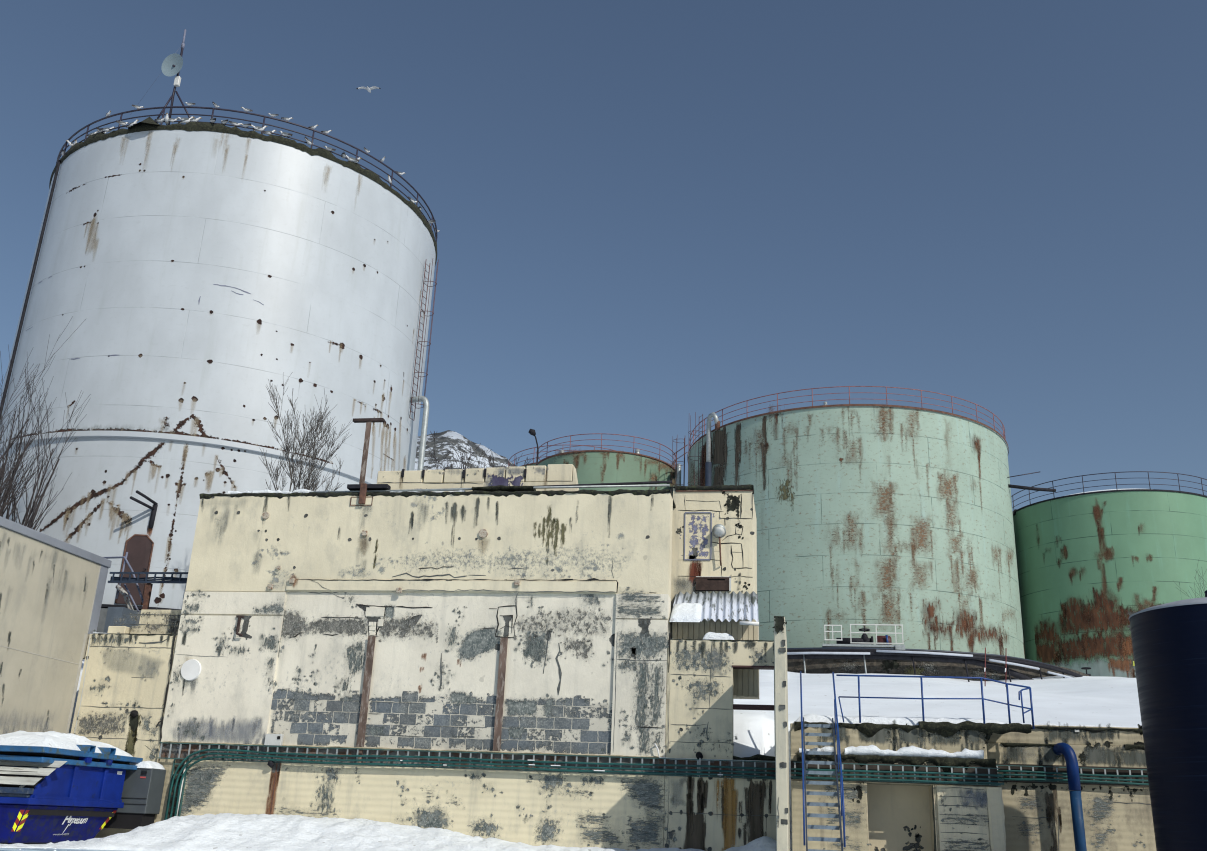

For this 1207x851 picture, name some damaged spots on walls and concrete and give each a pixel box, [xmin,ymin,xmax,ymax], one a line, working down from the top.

corrosion [0,382,333,604]
corrosion [691,407,811,512]
water stain [534,512,577,556]
corrosion [876,475,1012,655]
corrosion [1023,503,1161,678]
peeling [215,537,738,757]
peeling [274,764,360,818]
peeling [396,780,460,829]
peeling [516,772,683,849]
water stain [684,775,724,851]
water stain [738,779,772,845]
water stain [903,785,936,851]